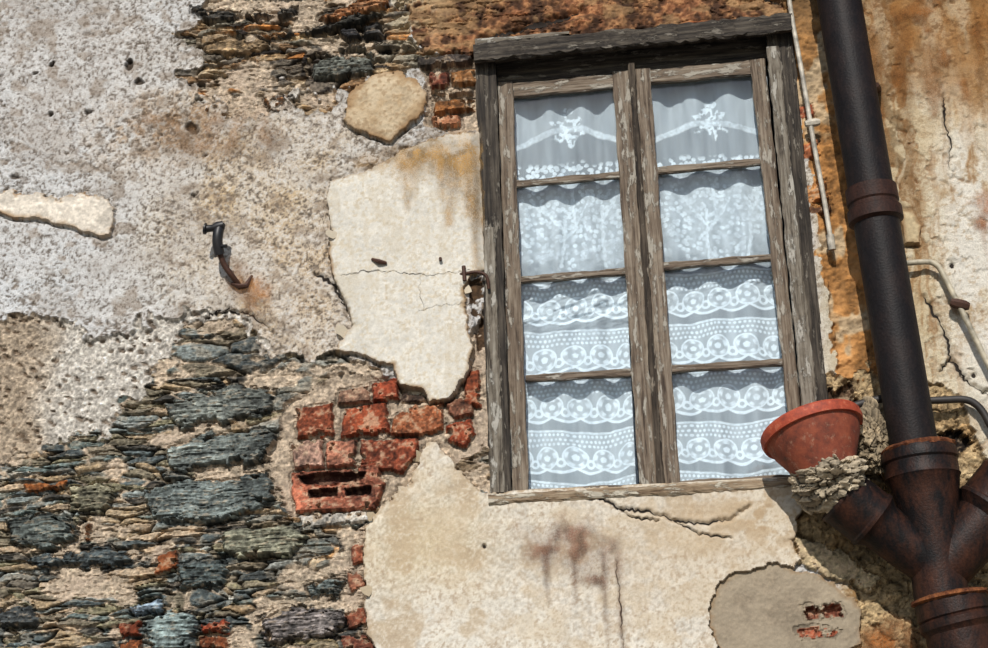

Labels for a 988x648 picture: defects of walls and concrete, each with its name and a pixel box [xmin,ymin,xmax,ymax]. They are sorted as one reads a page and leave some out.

crack [315,270,469,311]
spalling [0,0,490,648]
rust [880,436,957,456]
spalling [928,380,988,487]
crack [592,498,744,539]
water stain [533,526,587,573]
peeling [360,442,927,648]
rust [911,587,988,608]